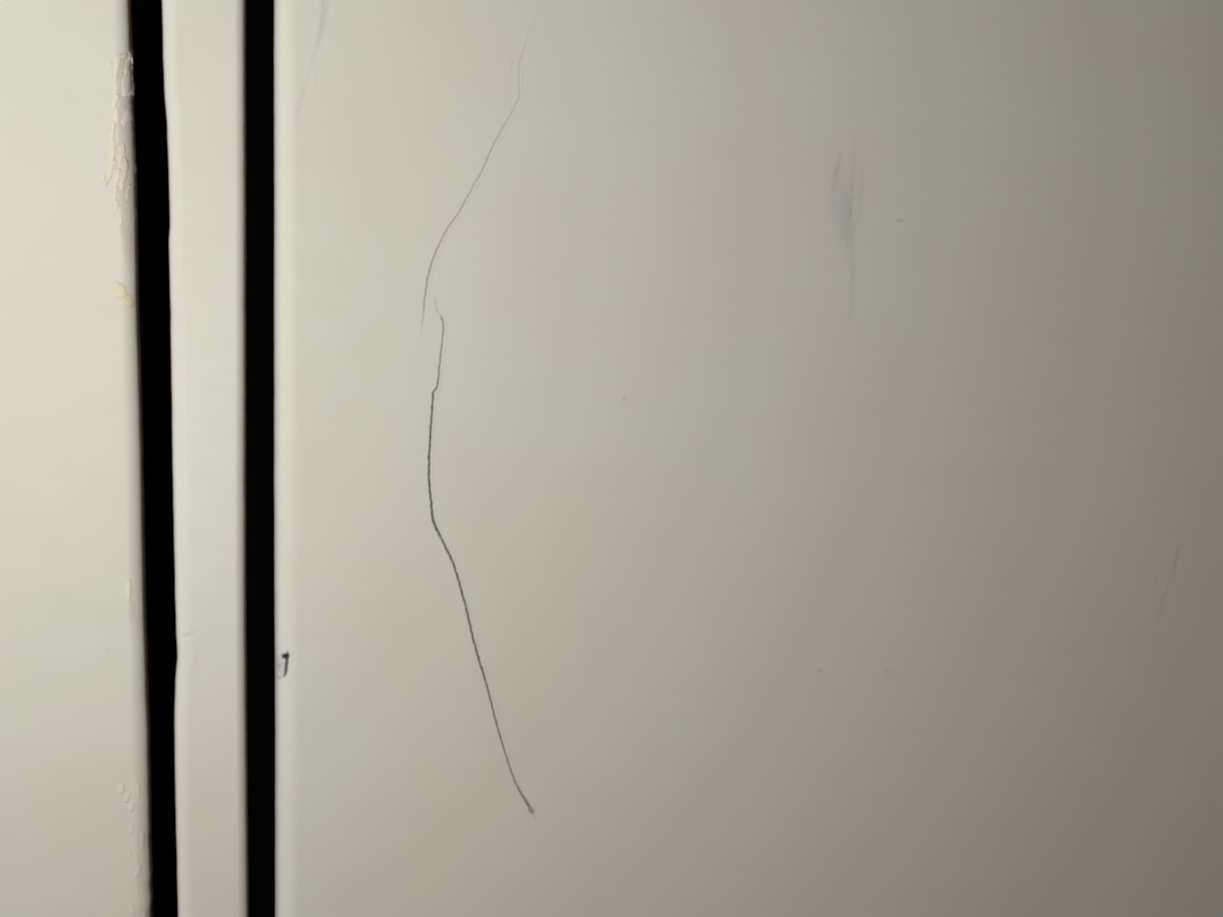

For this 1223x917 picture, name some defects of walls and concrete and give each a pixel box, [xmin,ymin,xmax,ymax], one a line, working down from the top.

peeling [101,52,134,226]
crack [428,320,529,806]